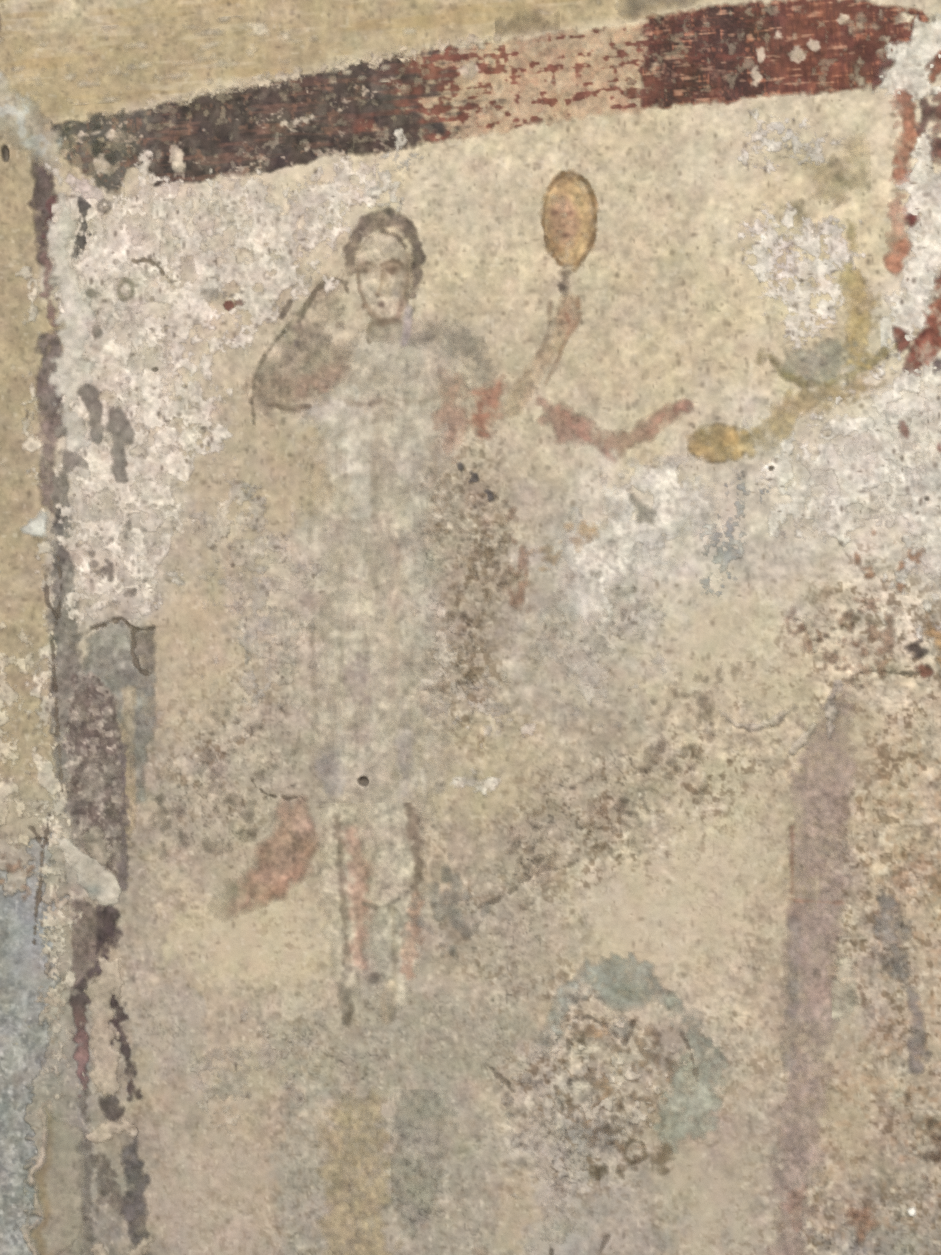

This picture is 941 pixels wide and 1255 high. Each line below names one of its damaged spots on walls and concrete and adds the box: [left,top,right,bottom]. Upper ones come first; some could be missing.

peeling [15,266,40,324]
damp [63,452,87,471]
damp [78,385,134,482]
peeling [21,129,423,710]
damp [90,552,113,580]
damp [536,457,771,715]
peeling [0,614,71,1255]
peeling [190,1024,304,1133]